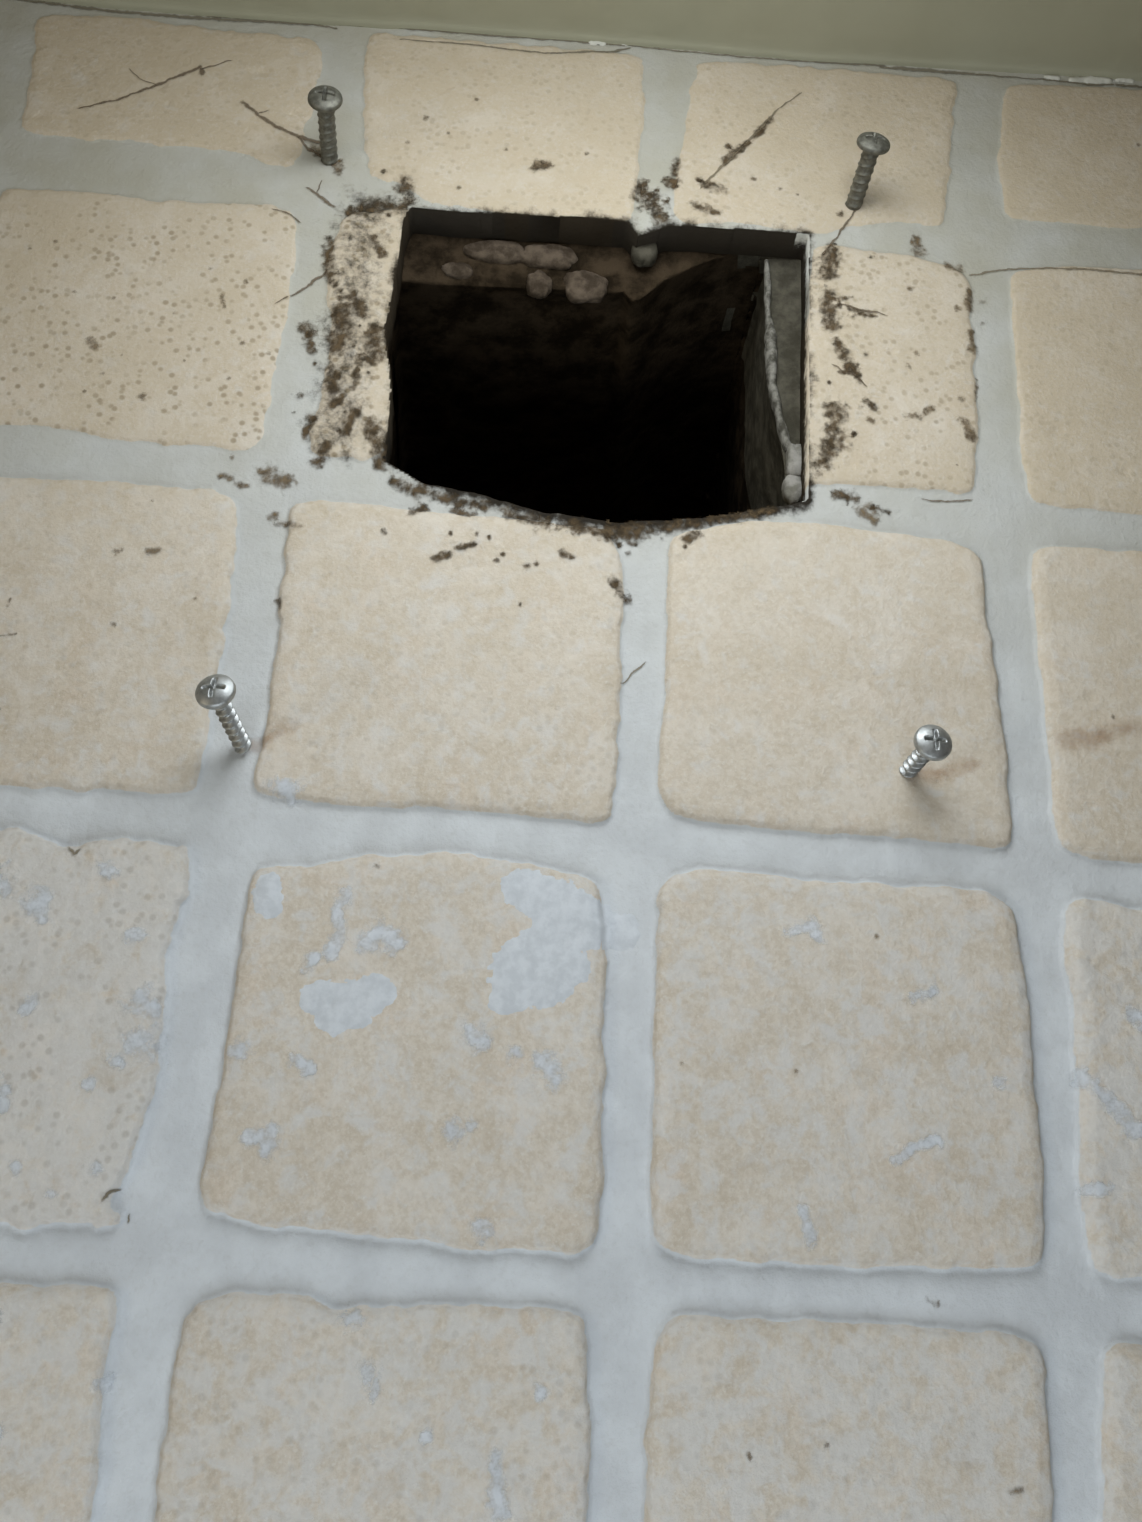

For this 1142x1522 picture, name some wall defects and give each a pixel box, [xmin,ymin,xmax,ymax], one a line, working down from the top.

spalling [299,887,407,1038]
spalling [486,868,641,1015]